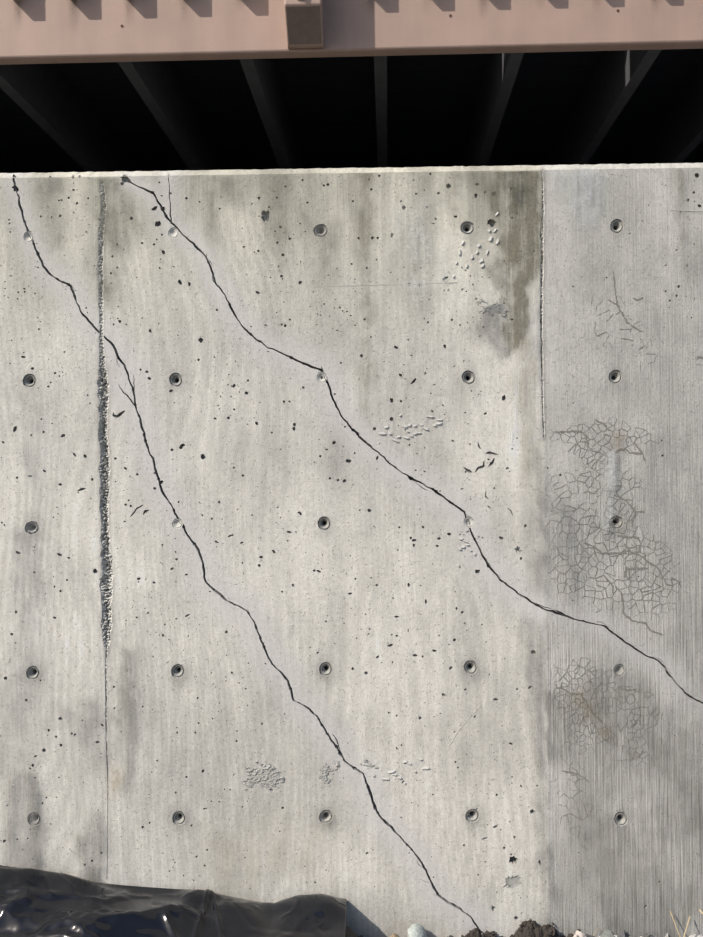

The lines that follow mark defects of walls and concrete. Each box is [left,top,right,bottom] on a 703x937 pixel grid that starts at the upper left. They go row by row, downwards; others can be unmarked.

crack [12,174,482,933]
crack [129,177,703,704]
water stain [484,171,542,352]
crack [549,657,663,851]